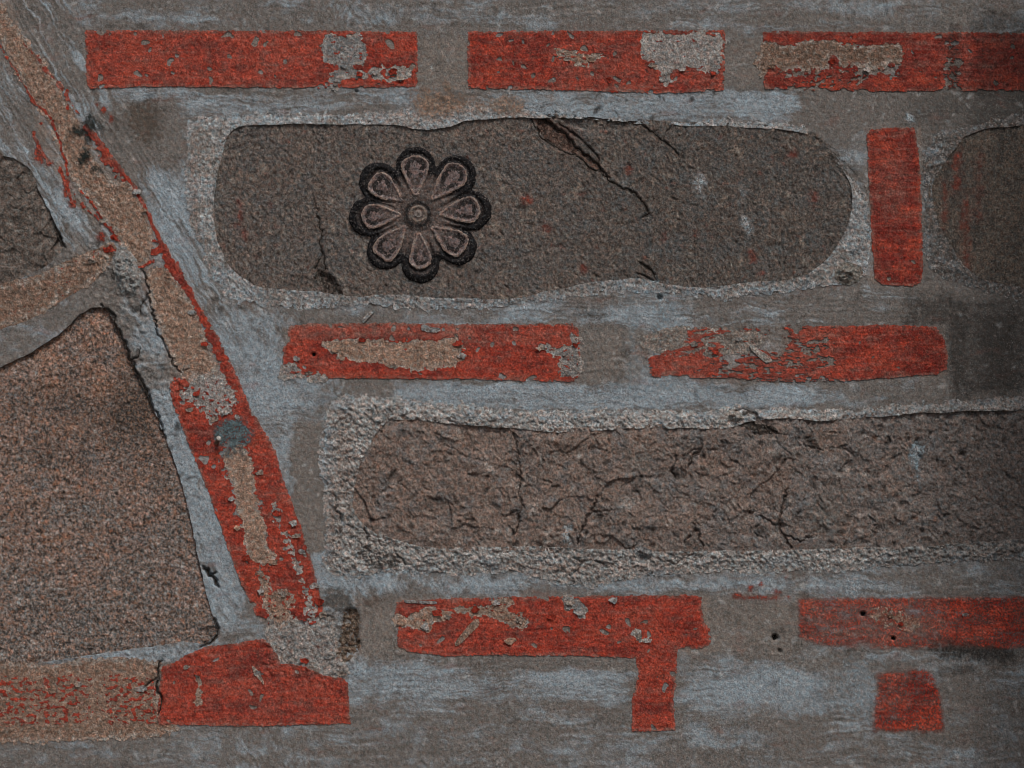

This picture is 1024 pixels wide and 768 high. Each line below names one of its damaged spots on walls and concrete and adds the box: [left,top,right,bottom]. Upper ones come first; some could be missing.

peeling [640,29,727,87]
peeling [753,39,905,78]
crack [524,106,649,216]
peeling [321,324,467,373]
peeling [536,332,585,378]
peeling [639,325,772,363]
crack [736,408,779,435]
crack [504,436,523,535]
peeling [223,444,362,679]
crack [571,496,608,575]
crack [760,489,811,548]
peeling [392,596,530,646]